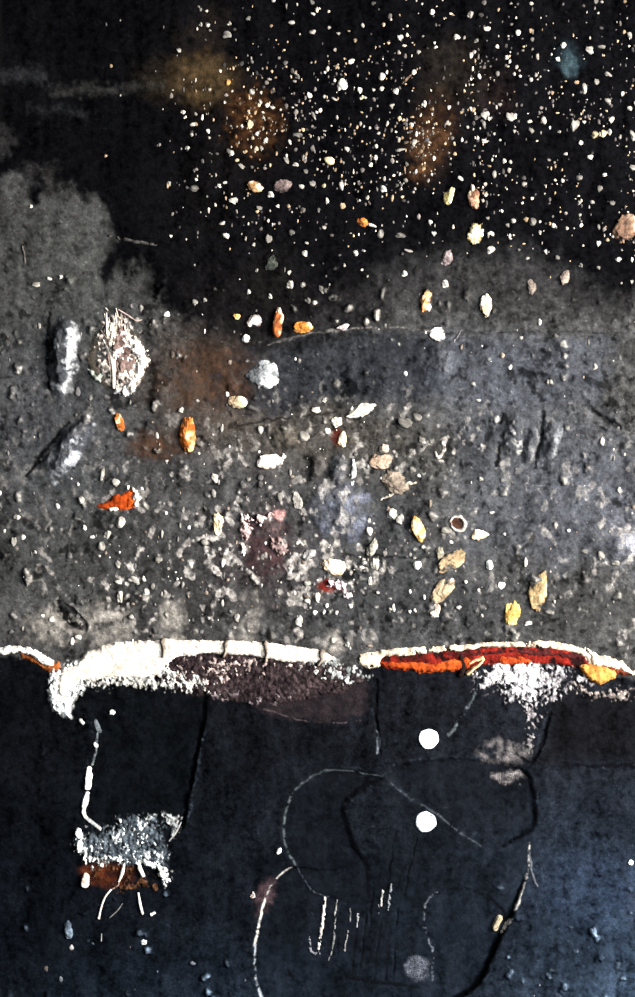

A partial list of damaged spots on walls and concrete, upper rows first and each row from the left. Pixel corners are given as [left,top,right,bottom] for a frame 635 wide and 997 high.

crack [591,405,621,429]
peeling [0,638,635,919]